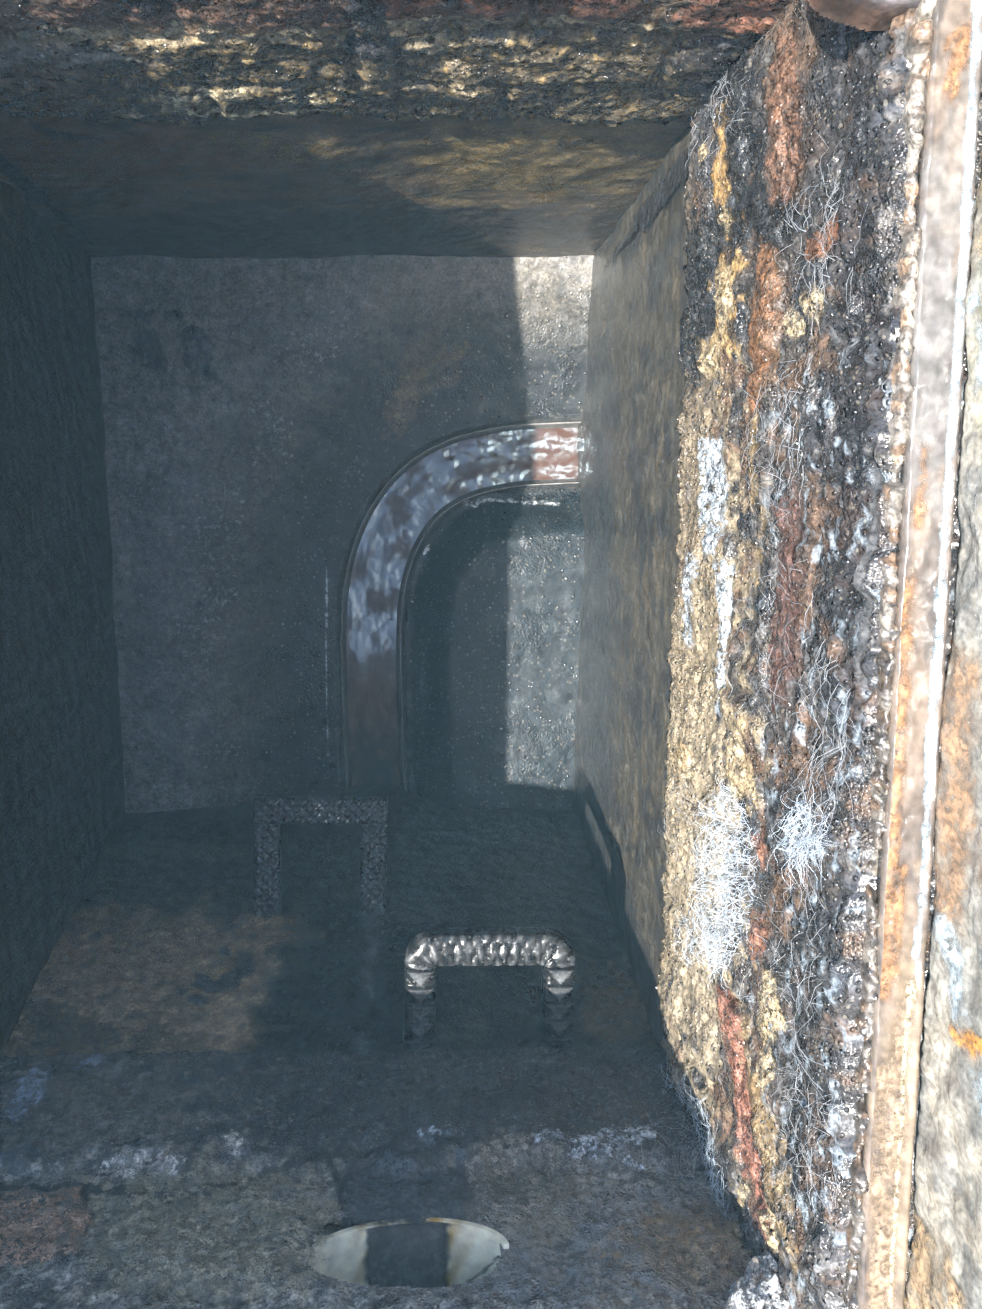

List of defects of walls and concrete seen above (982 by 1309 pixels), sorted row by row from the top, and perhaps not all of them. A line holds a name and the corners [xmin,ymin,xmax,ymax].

corrosion [944,26,972,100]
leakage [681,432,735,717]
corrosion [879,578,914,999]
corrosion [935,649,978,917]
leakage [4,883,425,1122]
leakage [476,967,658,1050]
corrosion [868,1002,964,1309]
corrosion [949,1028,982,1057]